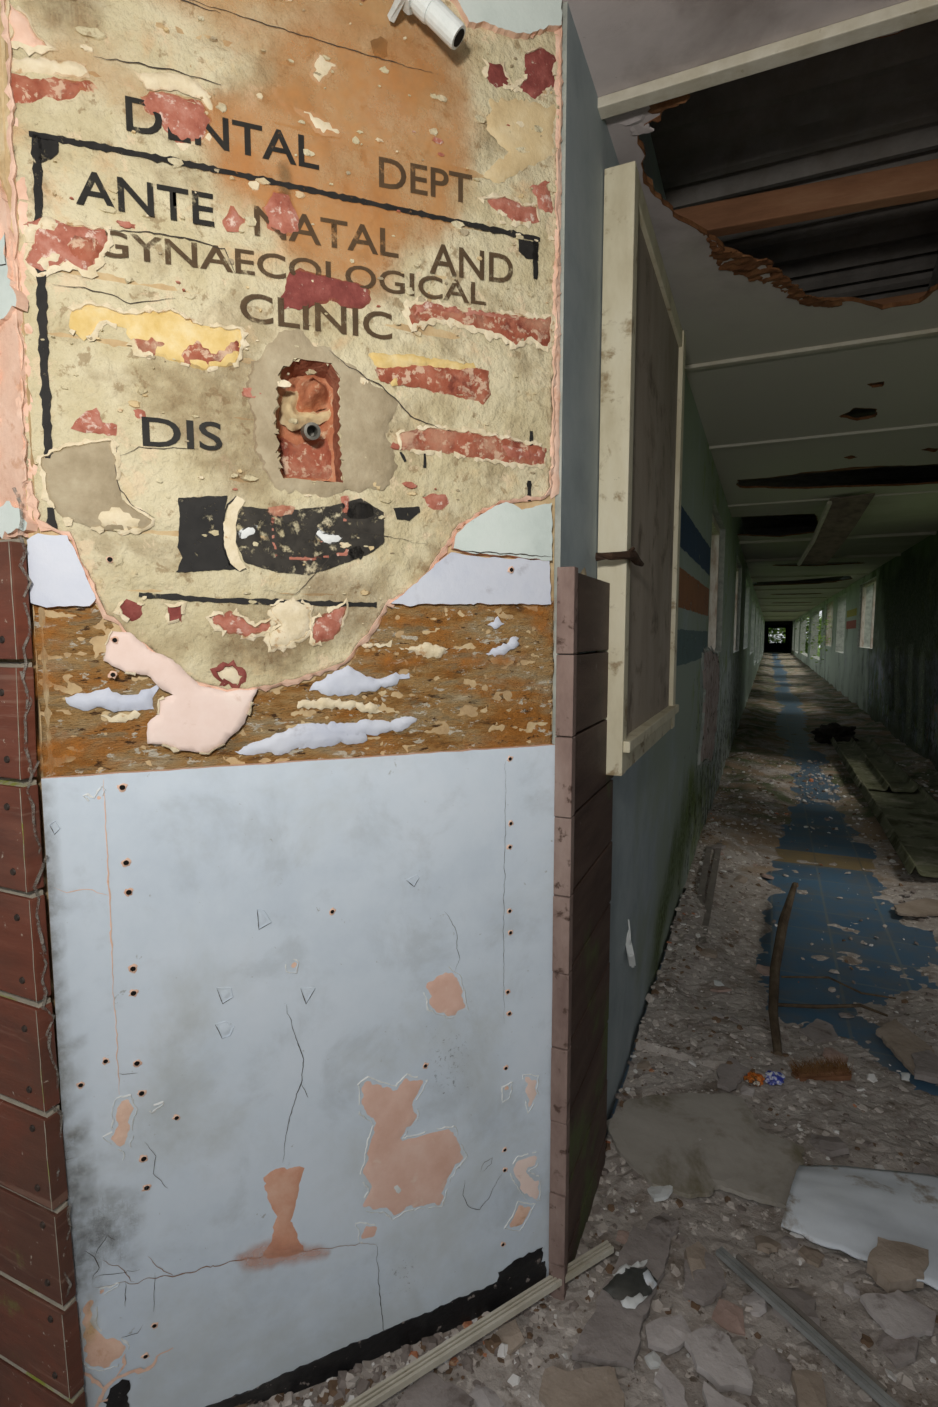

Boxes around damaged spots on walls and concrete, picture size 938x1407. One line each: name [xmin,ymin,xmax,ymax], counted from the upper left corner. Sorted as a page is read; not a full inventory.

spalling [0,0,564,755]
peeling [424,967,469,1019]
peeling [102,1090,180,1163]
peeling [249,1166,320,1265]
crack [283,1004,308,1159]
peeling [355,1062,468,1244]
peeling [501,1147,541,1247]
crack [85,1236,264,1337]
crack [297,1243,384,1331]
peeling [497,1247,543,1305]
peeling [78,1282,173,1407]